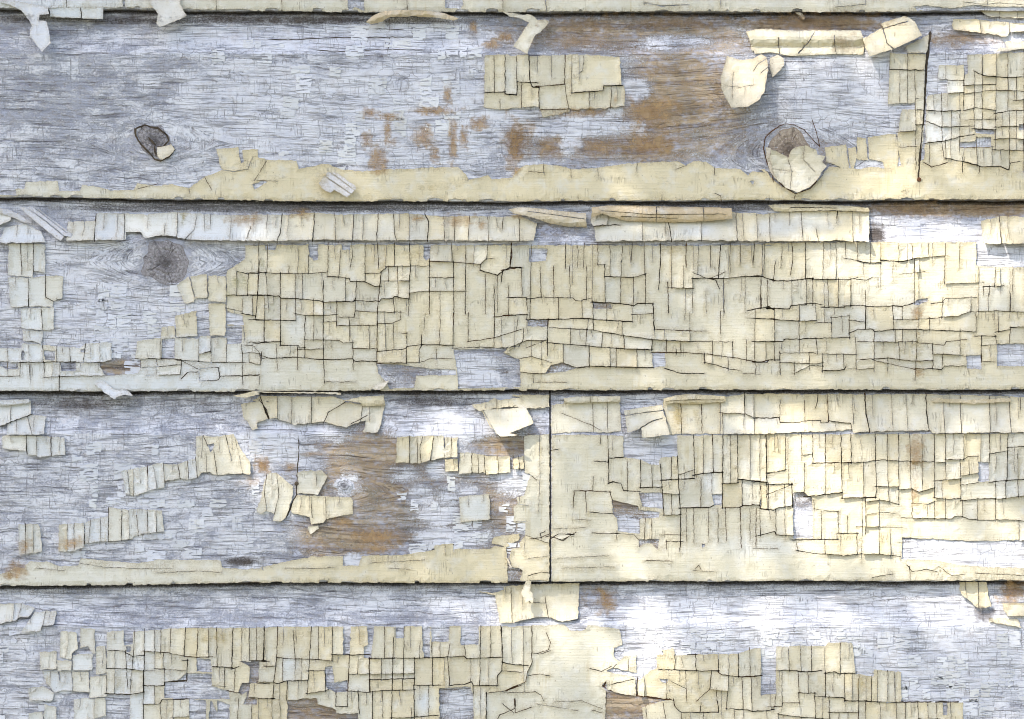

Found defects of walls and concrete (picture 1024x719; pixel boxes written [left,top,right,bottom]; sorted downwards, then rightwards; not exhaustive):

peeling [0,0,153,19]
peeling [419,25,625,139]
peeling [180,0,1024,77]
crack [888,33,1024,177]
peeling [0,110,1024,344]
peeling [86,283,162,376]
peeling [95,381,133,399]
crack [0,242,1024,582]
peeling [0,394,681,719]
crack [105,625,524,719]
crack [602,642,963,719]
peeling [752,540,1024,719]